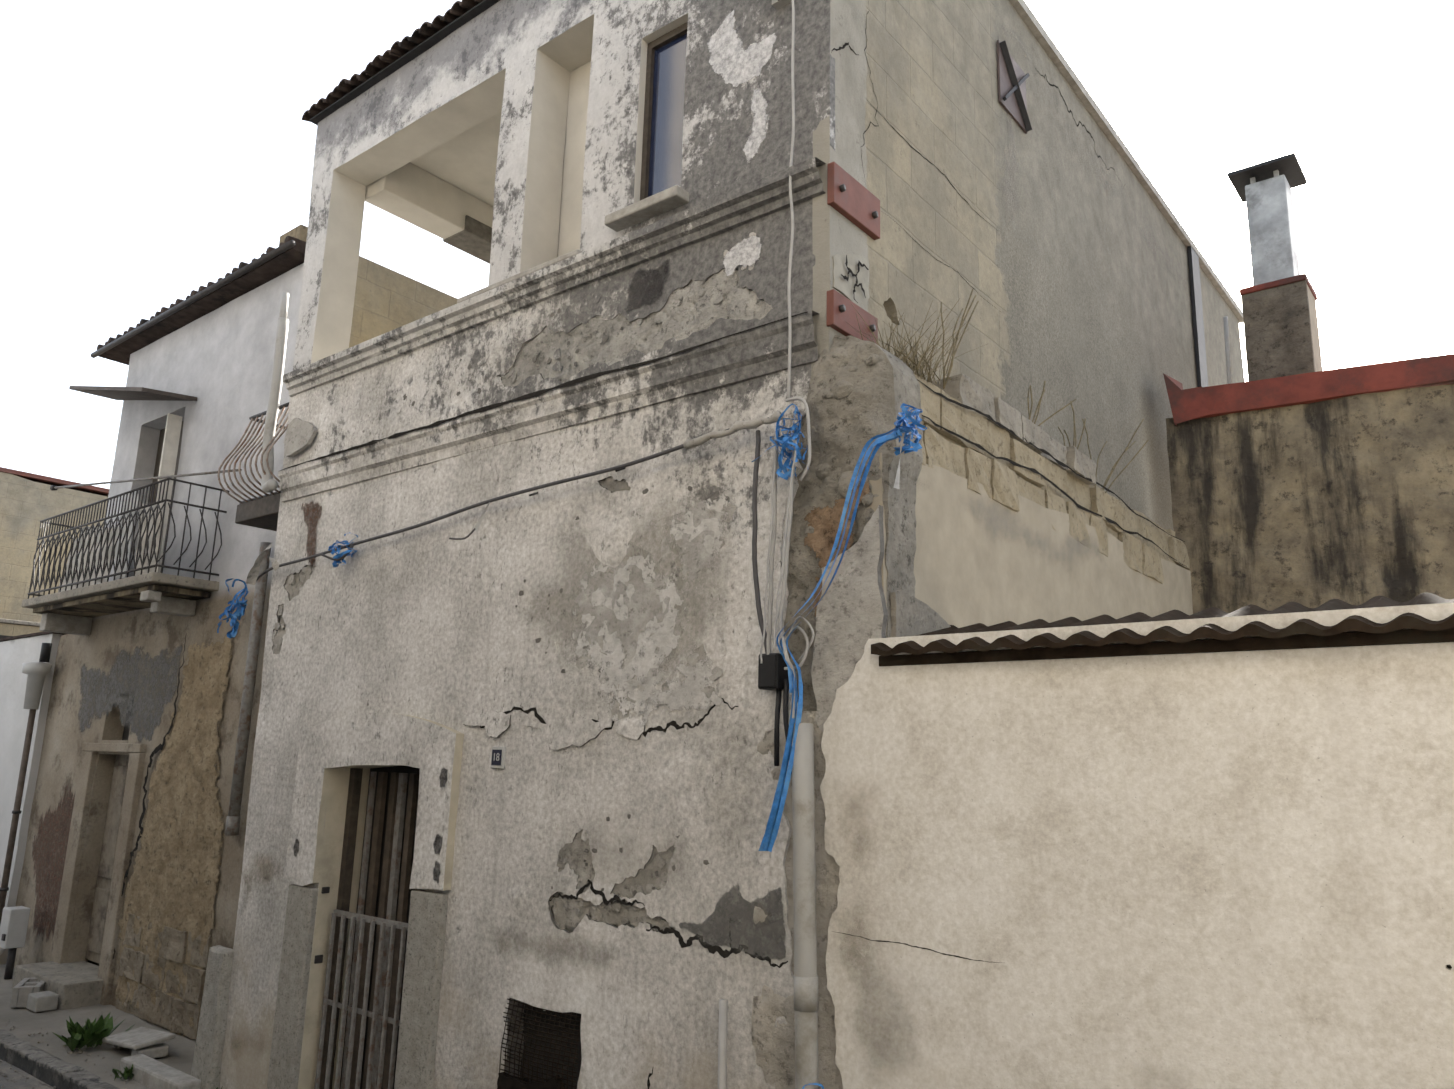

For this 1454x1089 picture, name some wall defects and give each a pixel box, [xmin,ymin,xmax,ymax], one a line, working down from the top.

crack [1036,69,1125,188]
spalling [784,335,923,1089]
spalling [549,814,695,933]
spalling [752,729,795,1089]
crack [832,931,1000,963]